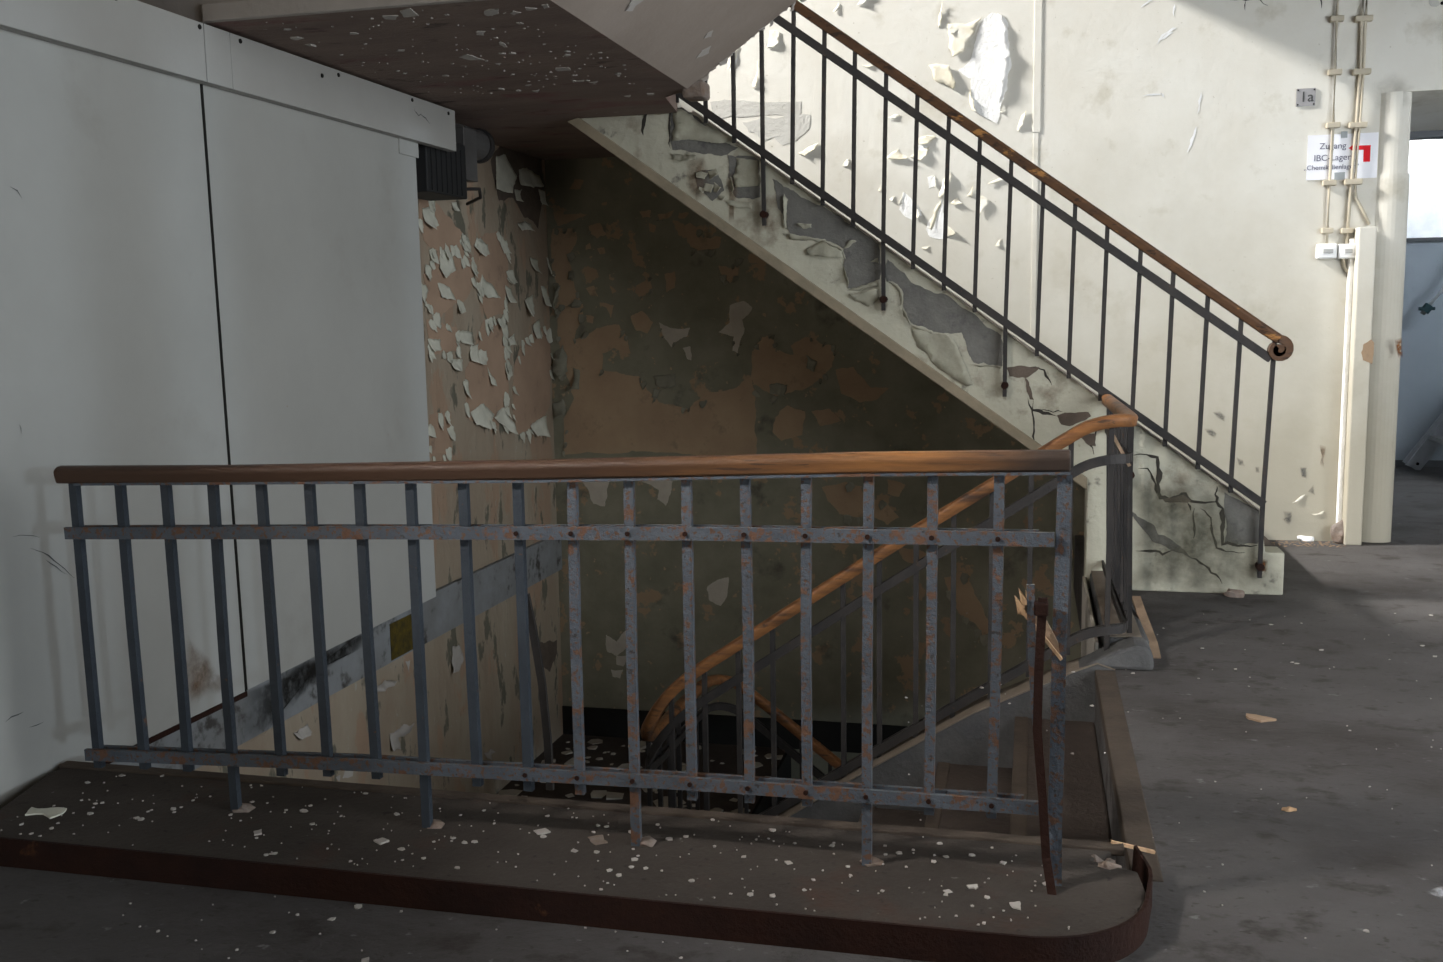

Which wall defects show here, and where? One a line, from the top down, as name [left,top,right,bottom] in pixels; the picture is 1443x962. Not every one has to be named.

peeling [491,146,548,231]
peeling [670,0,1091,426]
peeling [419,199,760,461]
crack [1031,400,1097,454]
peeling [583,481,609,506]
peeling [822,479,905,526]
crack [1135,454,1260,553]
peeling [707,577,729,606]
peeling [606,631,626,678]
spalling [1019,608,1075,673]